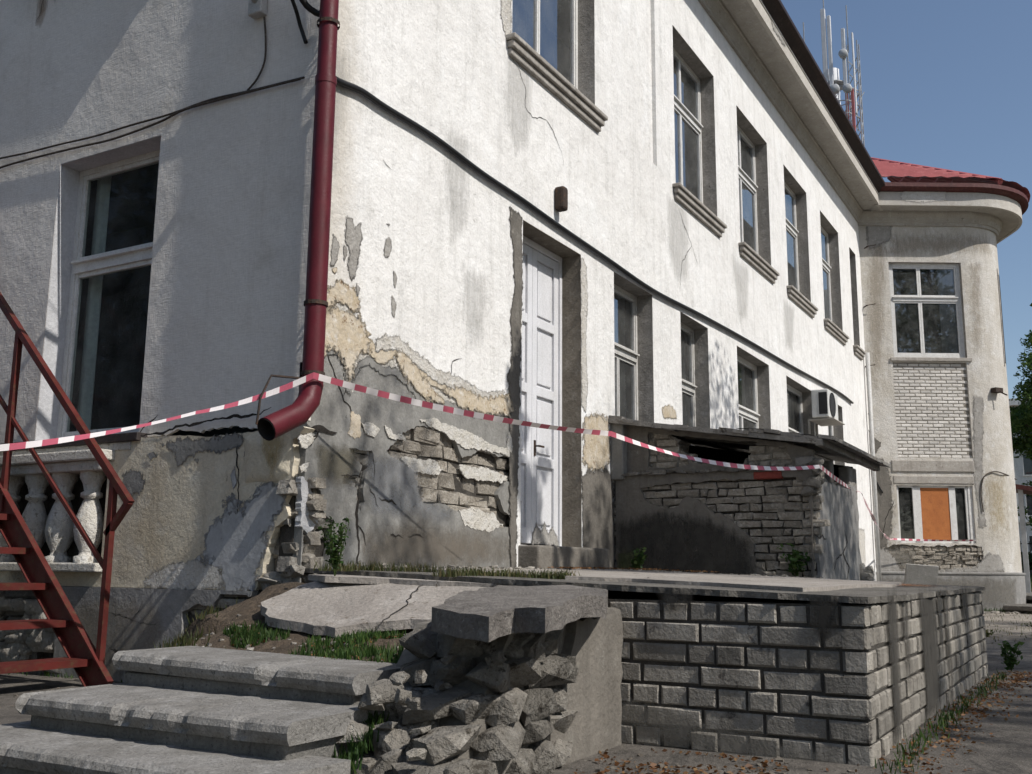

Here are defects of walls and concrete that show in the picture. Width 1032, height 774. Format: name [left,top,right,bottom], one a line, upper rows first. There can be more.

flaking render [143,206,523,627]
peeling [122,469,146,496]
peeling [531,521,559,546]
damp [617,513,750,575]
crack [815,530,850,579]
crack [370,575,427,639]